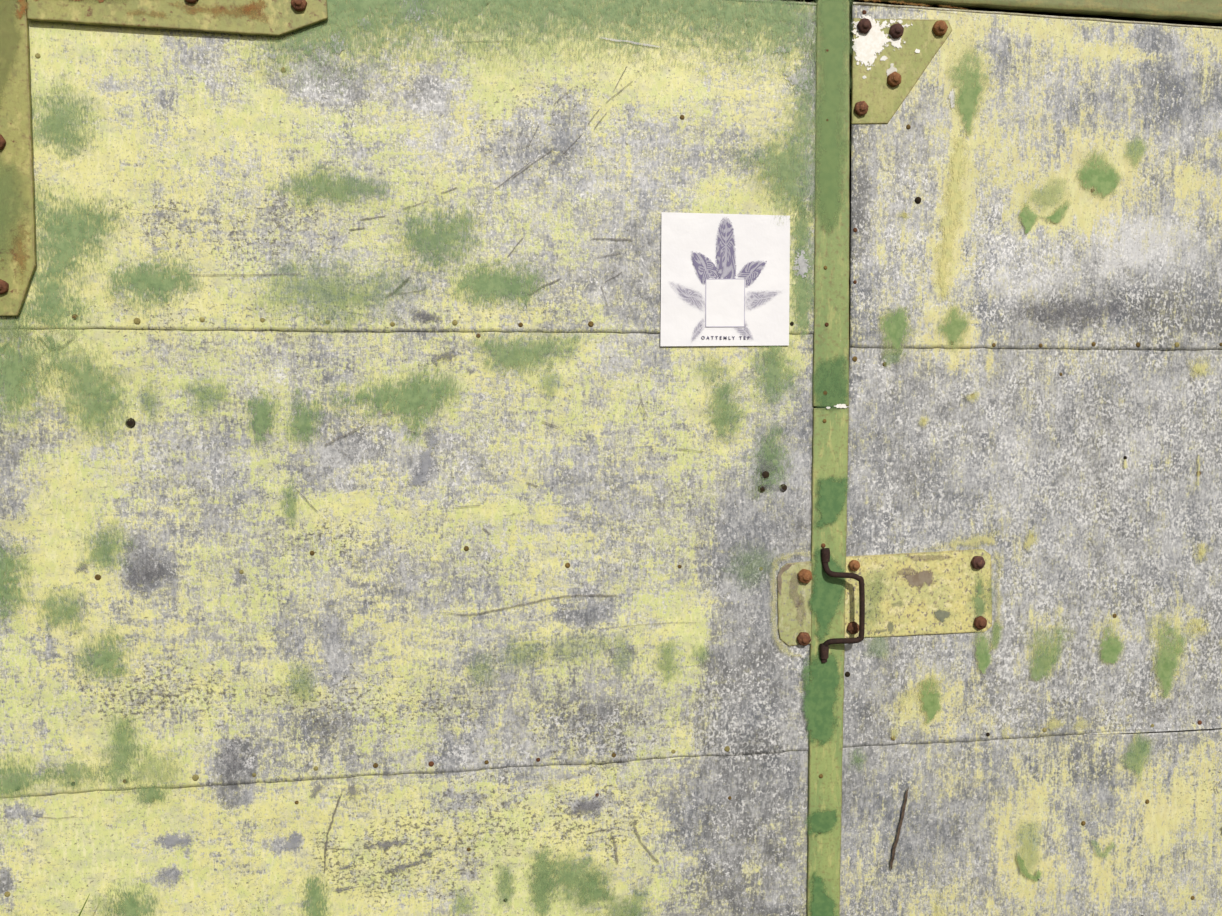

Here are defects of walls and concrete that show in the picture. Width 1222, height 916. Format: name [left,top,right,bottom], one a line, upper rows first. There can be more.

peeling [852,15,920,79]